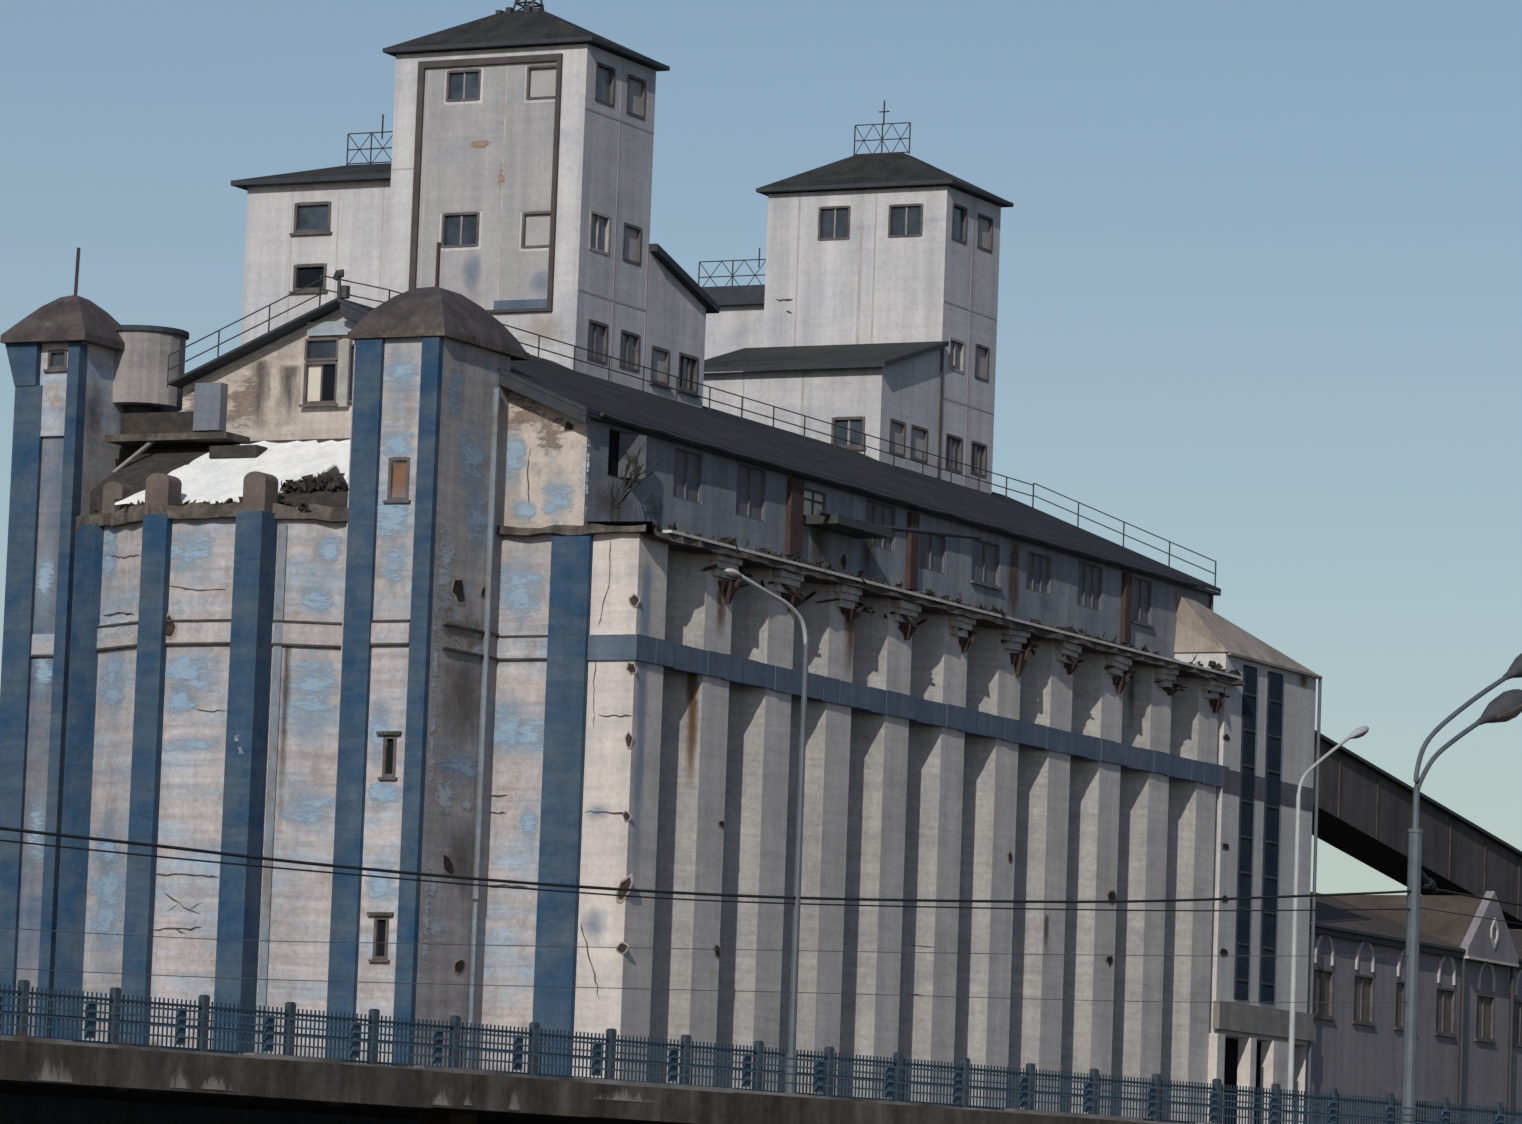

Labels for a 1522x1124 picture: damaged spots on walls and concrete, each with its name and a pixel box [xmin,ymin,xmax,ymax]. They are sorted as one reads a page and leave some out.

crack [153,873,216,934]